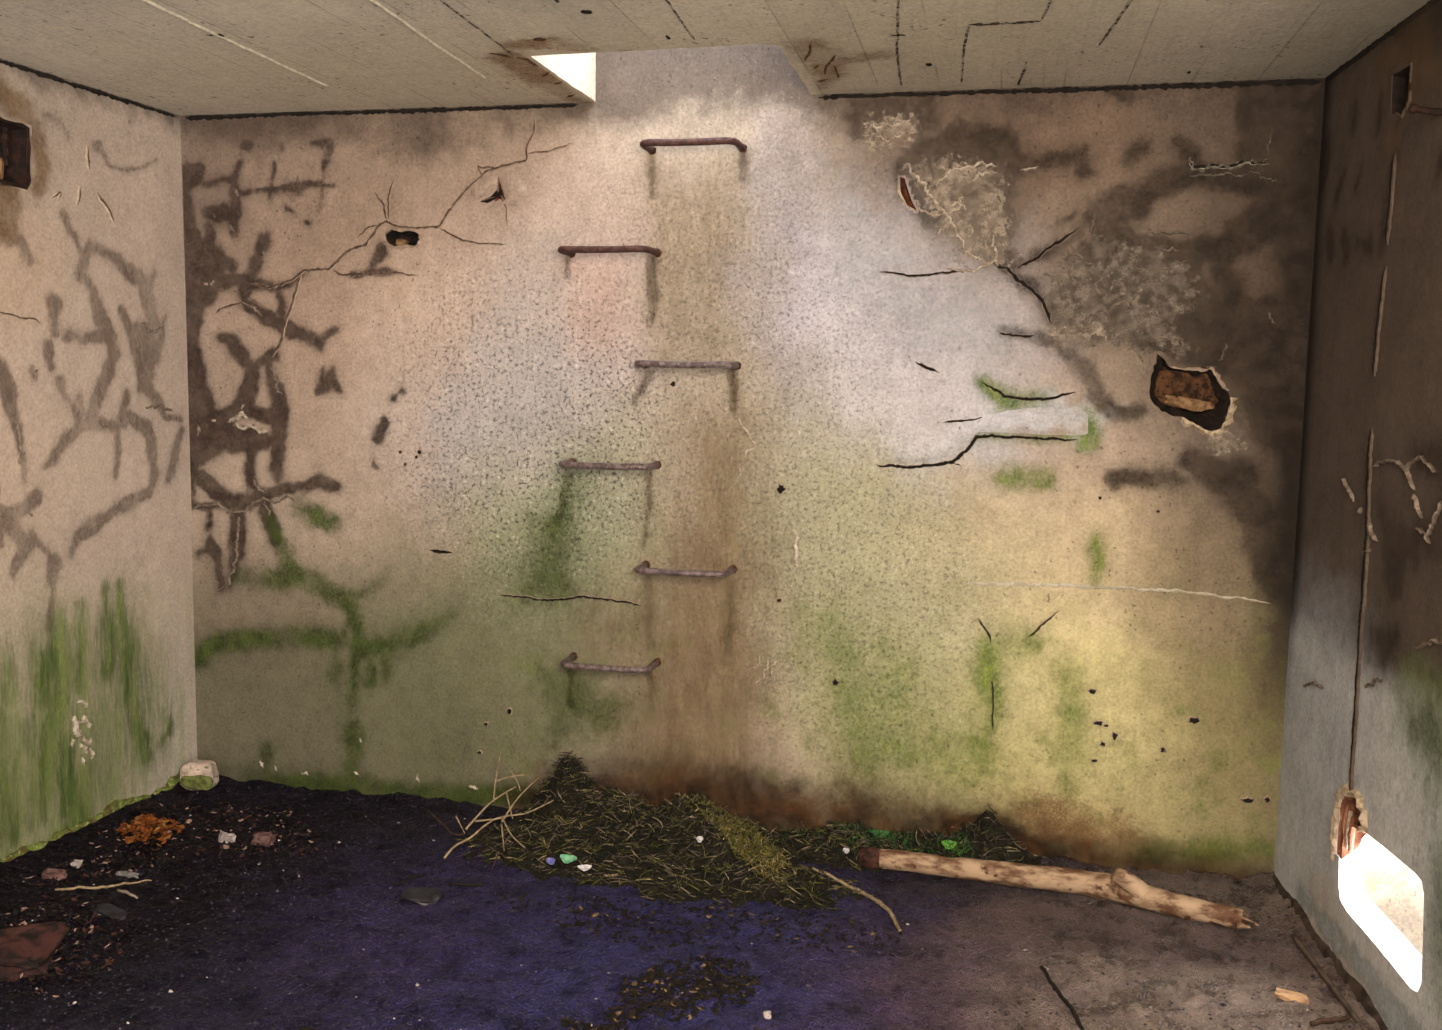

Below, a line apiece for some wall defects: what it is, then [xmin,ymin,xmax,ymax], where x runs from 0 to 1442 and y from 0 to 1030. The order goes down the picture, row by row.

crack [818,0,1439,101]
rust [0,80,49,242]
damp [0,138,342,591]
crack [0,59,579,358]
crack [880,270,958,278]
crack [877,383,1077,469]
damp [848,78,1318,597]
spalling [1150,352,1239,437]
damp [1341,453,1442,597]
crack [1349,428,1374,791]
damp [0,602,95,843]
spalling [1329,782,1368,861]